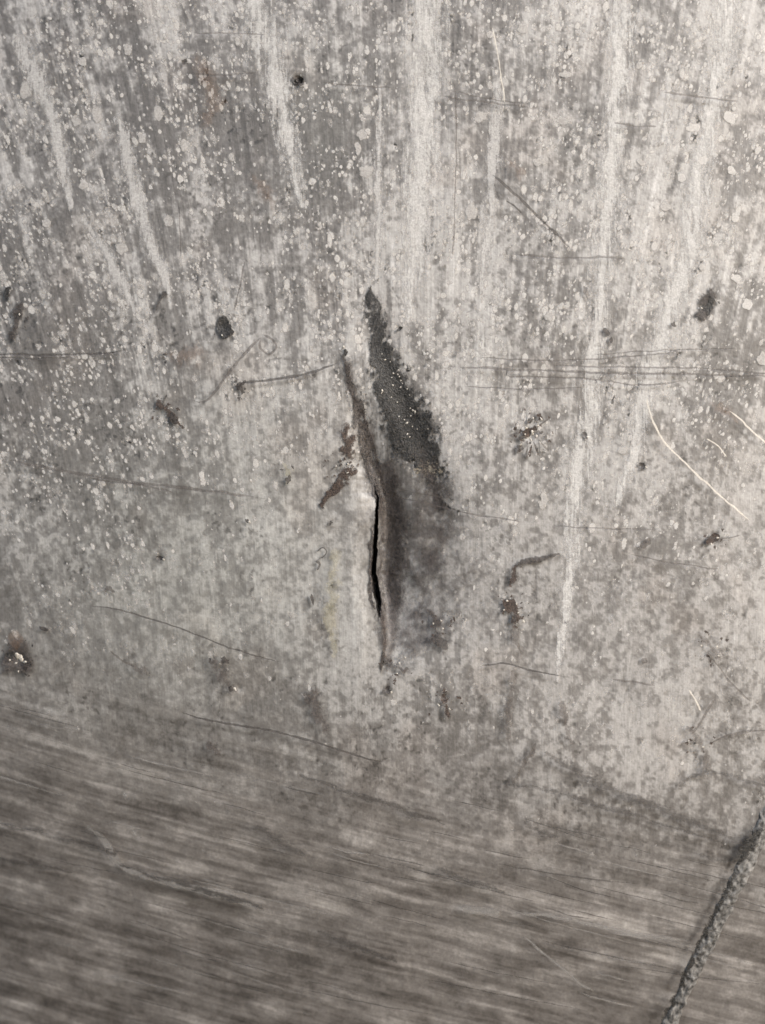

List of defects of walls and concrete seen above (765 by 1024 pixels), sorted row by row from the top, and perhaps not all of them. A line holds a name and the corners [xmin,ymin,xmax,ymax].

damp [398,0,451,323]
crack [342,345,385,672]
damp [342,85,454,611]